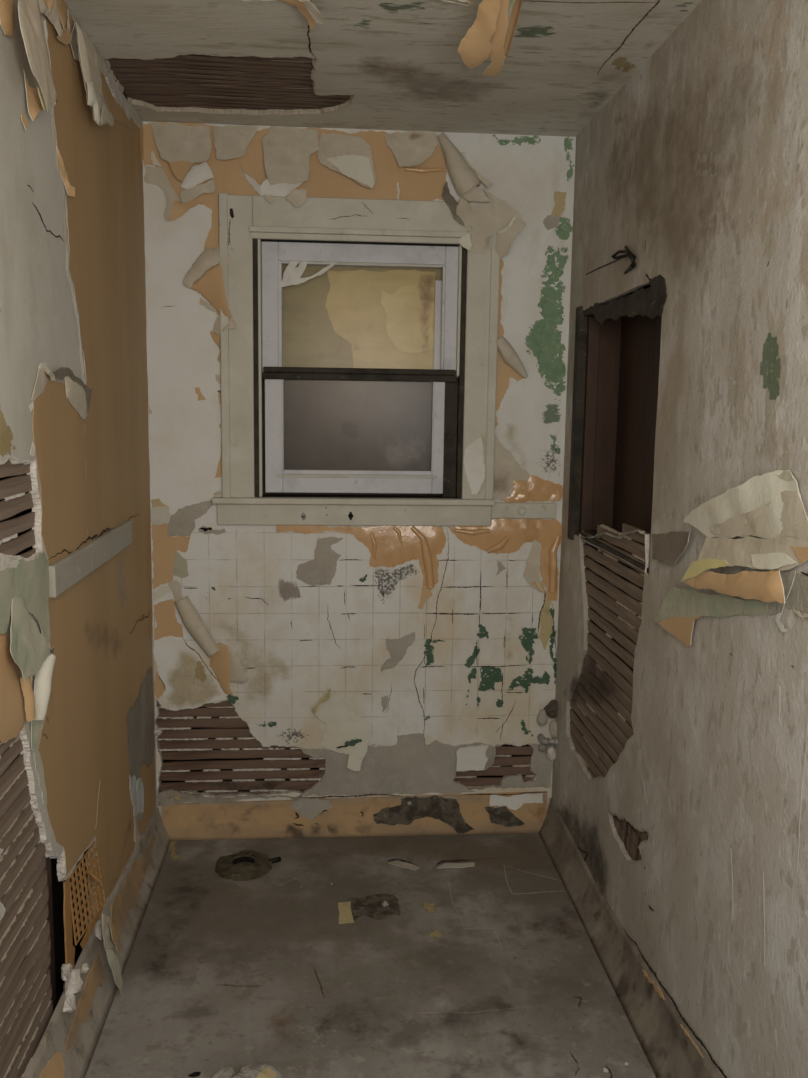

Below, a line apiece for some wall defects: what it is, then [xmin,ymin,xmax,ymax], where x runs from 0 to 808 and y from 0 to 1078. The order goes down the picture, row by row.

crack [307,0,317,60]
crack [532,0,660,75]
crack [27,185,65,242]
spalling [543,191,573,240]
crack [48,514,140,560]
peeling [0,0,566,1078]
crack [291,559,380,668]
crack [364,531,557,748]
peeling [566,470,808,782]
spalling [608,809,649,869]